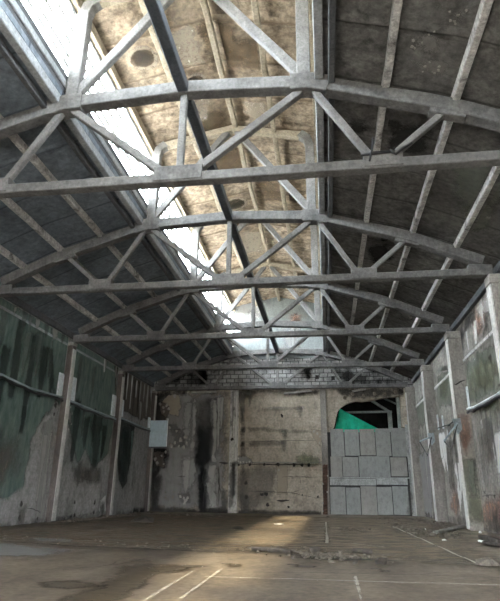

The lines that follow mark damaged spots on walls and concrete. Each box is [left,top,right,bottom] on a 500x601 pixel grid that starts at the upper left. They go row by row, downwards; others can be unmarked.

flaking render [162,394,181,416]
water stain [150,389,321,515]
corrosion [458,416,471,453]